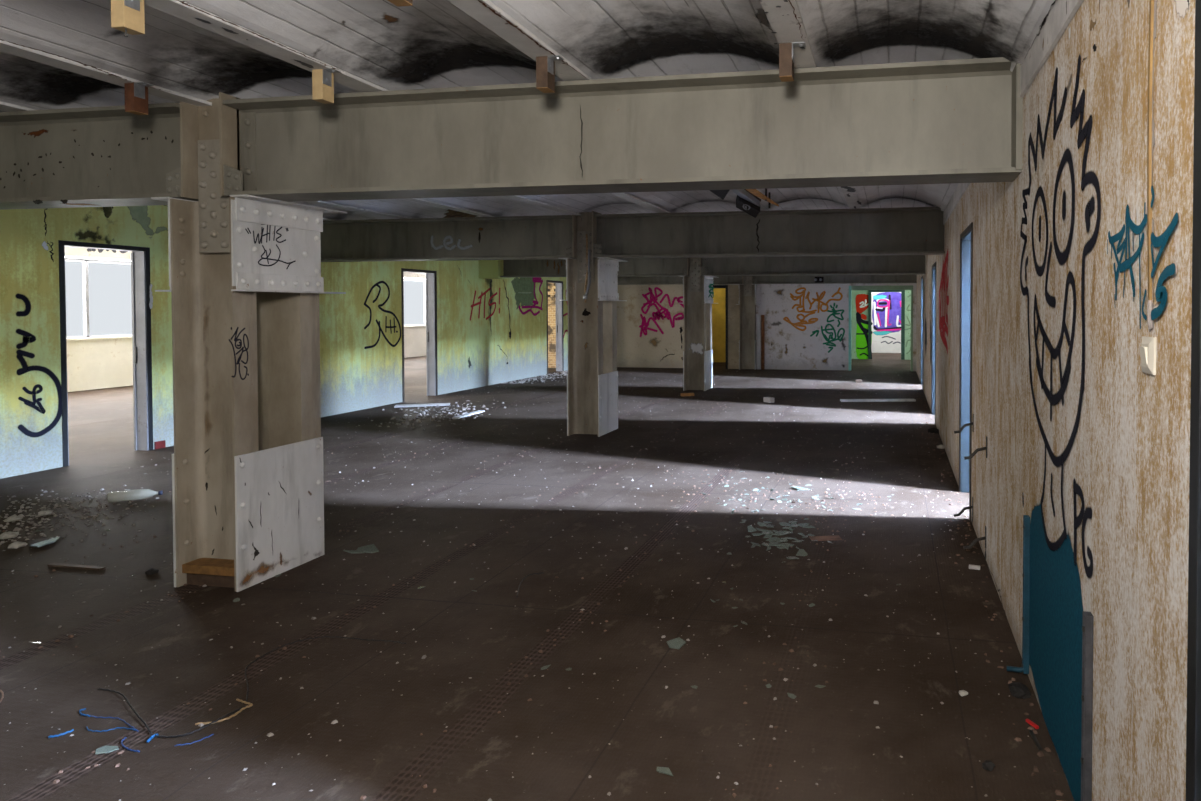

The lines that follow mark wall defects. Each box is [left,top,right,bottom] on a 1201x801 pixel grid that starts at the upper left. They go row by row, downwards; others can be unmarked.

leakage [756,9,773,31]
crack [577,107,585,176]